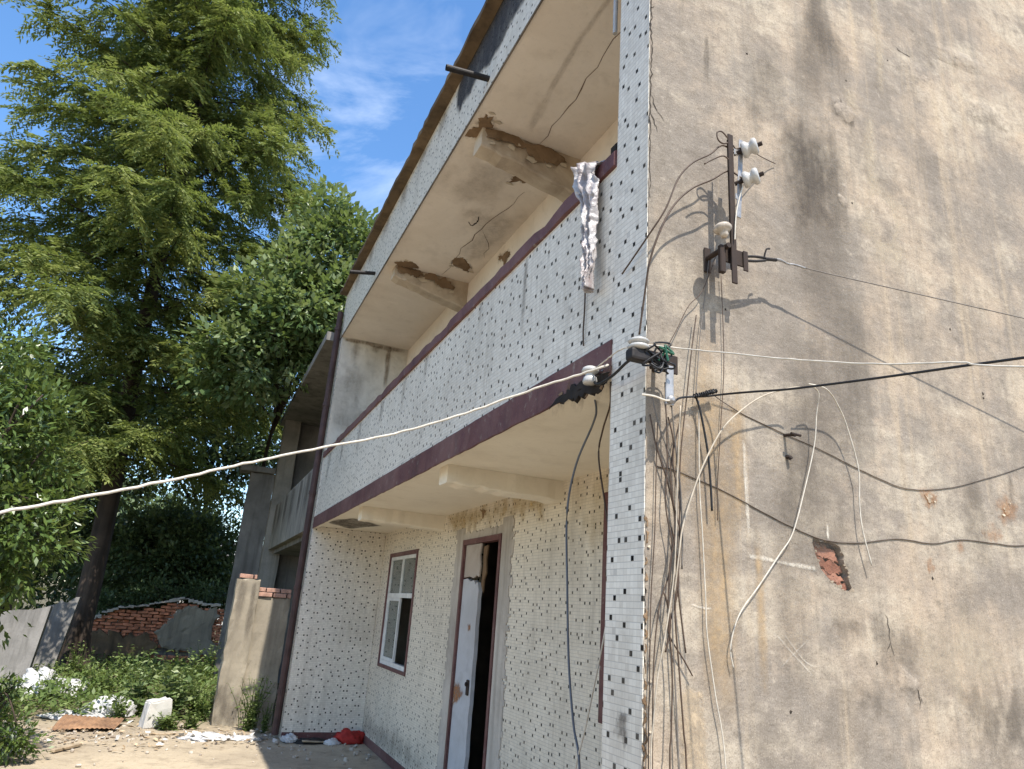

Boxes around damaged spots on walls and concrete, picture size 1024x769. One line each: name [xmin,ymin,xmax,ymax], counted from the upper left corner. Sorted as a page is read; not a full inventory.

crack [543,33,620,141]
spalling [465,112,567,168]
crack [444,193,523,273]
spalling [395,257,474,293]
flaking render [812,536,854,592]